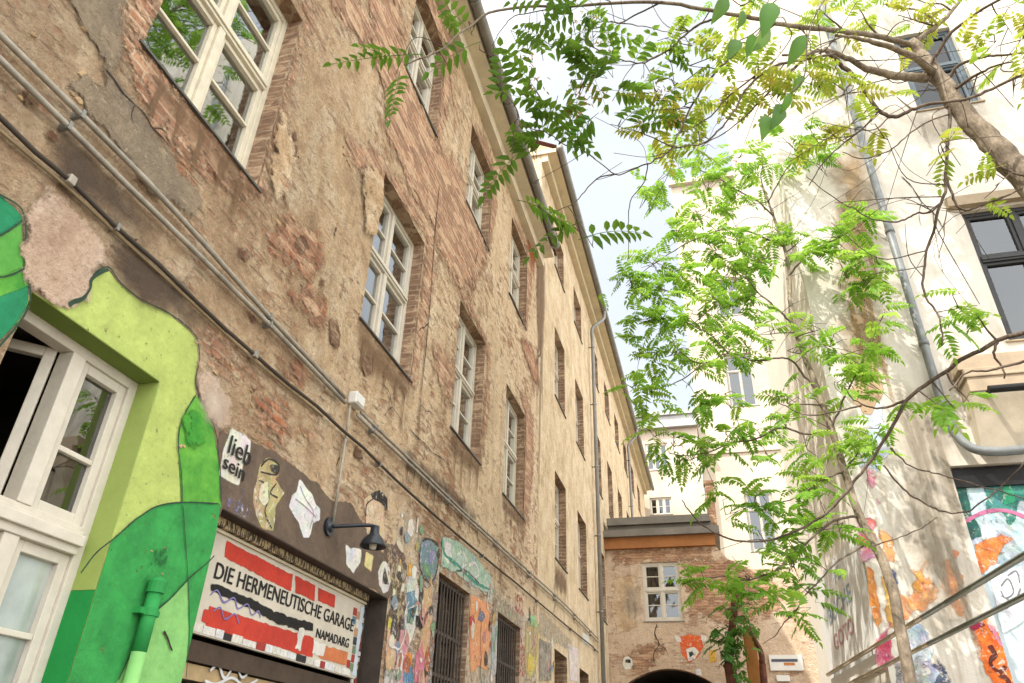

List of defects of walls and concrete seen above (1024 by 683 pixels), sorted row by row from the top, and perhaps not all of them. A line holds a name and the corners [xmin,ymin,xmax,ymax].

flaking render [69,0,319,216]
peeling [20,186,106,309]
flaking render [238,205,340,348]
peeling [179,328,236,449]